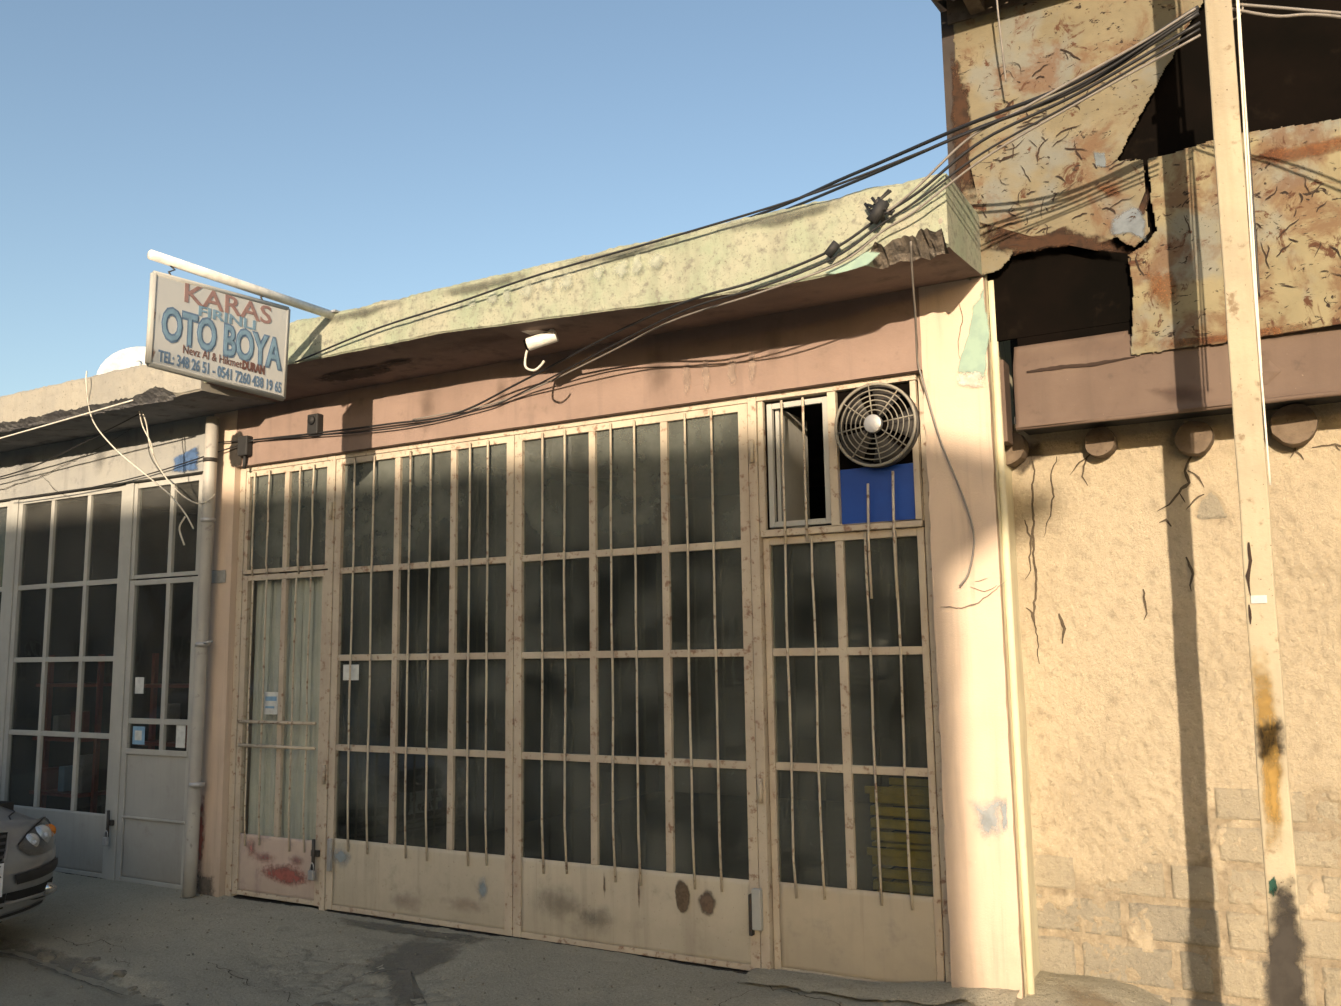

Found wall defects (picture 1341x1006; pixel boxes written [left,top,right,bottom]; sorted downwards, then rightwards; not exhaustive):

corrosion [951,0,1227,355]
corrosion [1241,119,1341,336]
crack [1158,456,1205,527]
crack [1290,443,1341,460]
crack [1141,589,1149,620]
crack [1185,557,1194,590]
crack [1245,542,1253,624]
corrosion [1255,675,1282,825]
water stain [675,880,715,915]
flaking render [1033,787,1268,1006]
flaking render [1290,791,1341,1006]